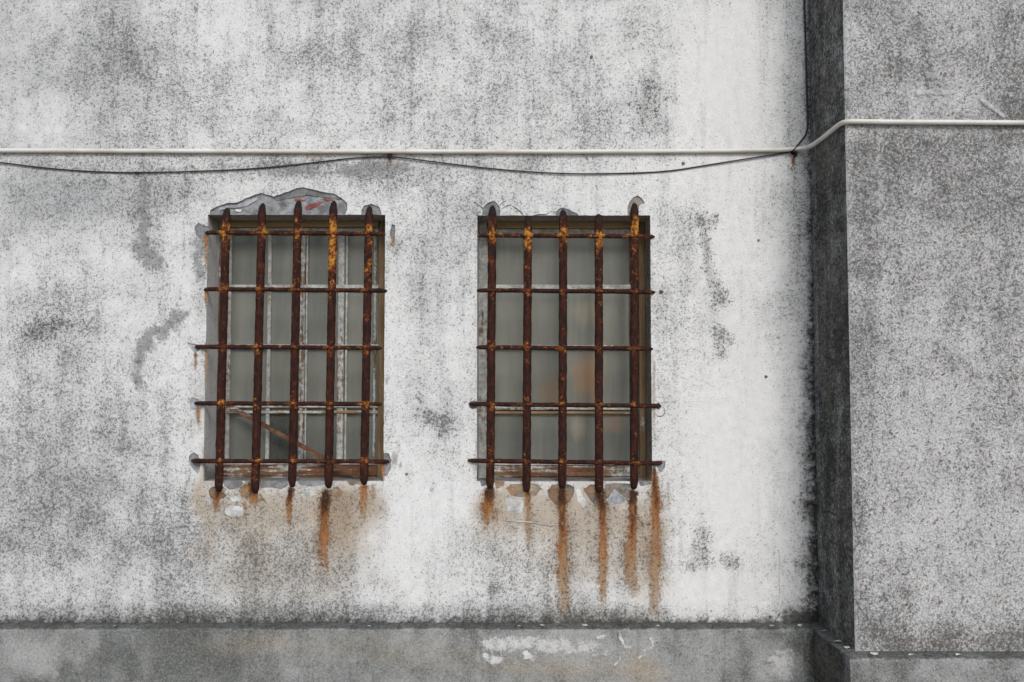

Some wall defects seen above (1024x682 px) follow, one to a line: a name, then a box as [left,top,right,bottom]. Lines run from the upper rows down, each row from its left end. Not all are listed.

flaking render [195,188,347,239]
damp [0,6,819,666]
corrosion [286,487,295,524]
corrosion [318,489,331,571]
corrosion [359,485,374,514]
corrosion [481,487,497,525]
corrosion [556,488,569,610]
flaking render [494,481,650,515]
corrosion [595,489,608,600]
corrosion [624,467,662,609]